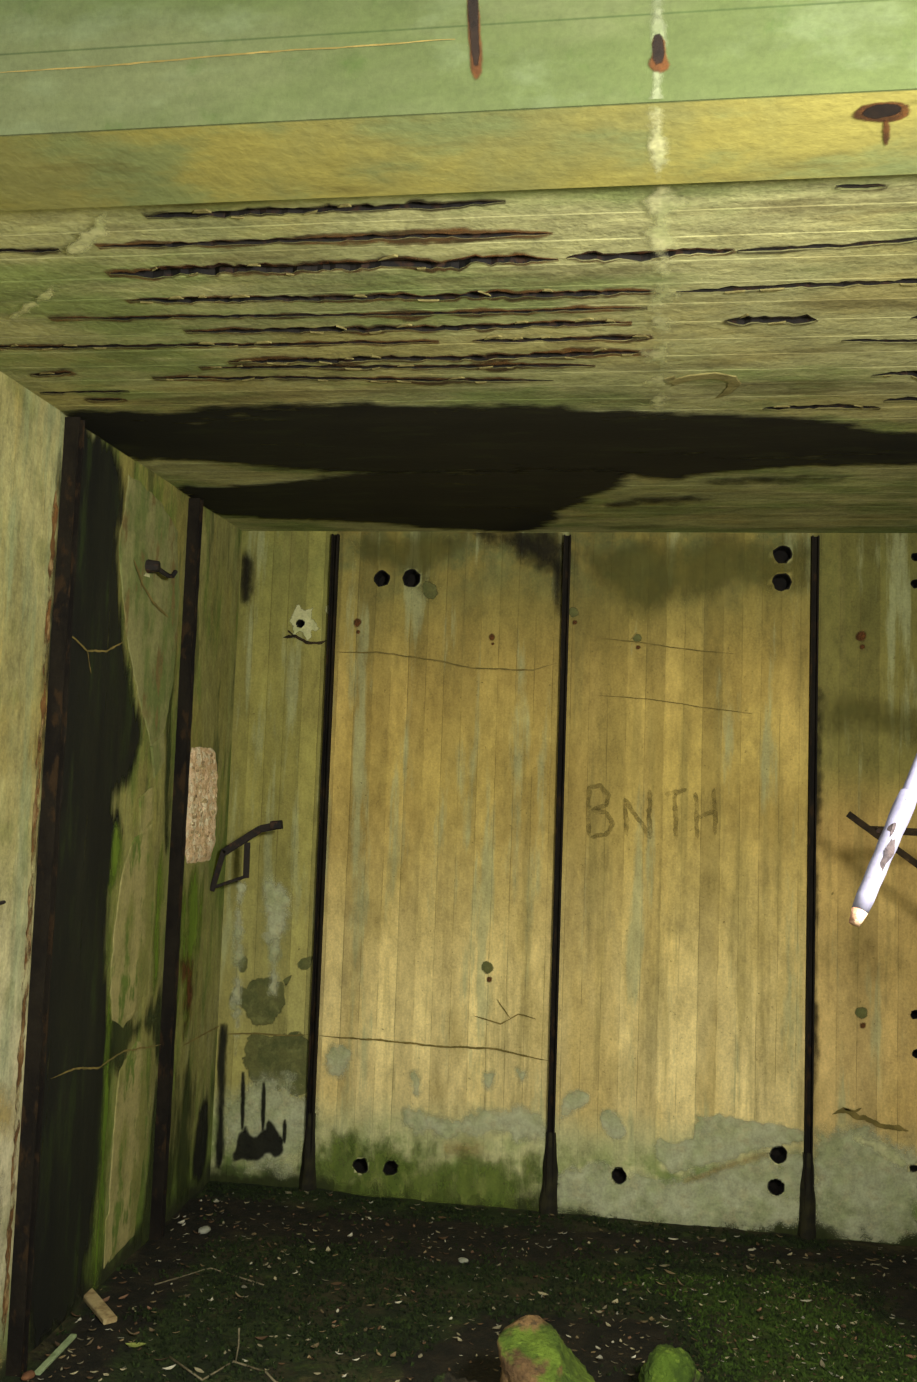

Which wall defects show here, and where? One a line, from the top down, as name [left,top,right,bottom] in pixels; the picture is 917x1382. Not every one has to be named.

rust [468,0,482,79]
damp [651,0,666,42]
rust [649,34,669,72]
damp [649,71,667,171]
rust [854,102,910,145]
damp [68,214,107,253]
damp [645,187,679,331]
spalling [185,747,218,864]
damp [30,345,917,1349]